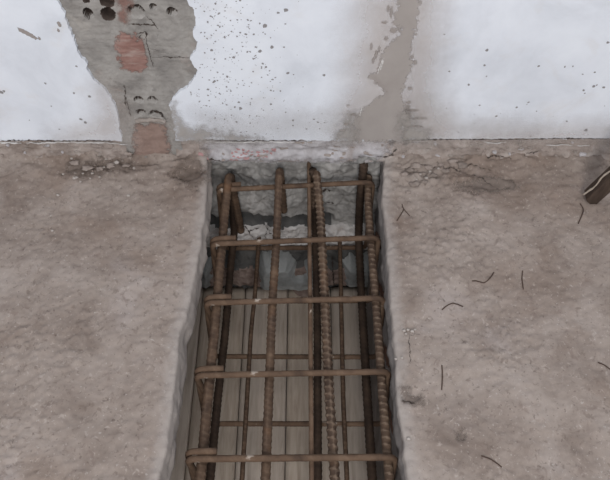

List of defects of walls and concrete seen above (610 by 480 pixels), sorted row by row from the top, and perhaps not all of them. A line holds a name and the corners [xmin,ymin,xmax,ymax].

flaking render [200,0,262,64]
crack [403,137,608,189]